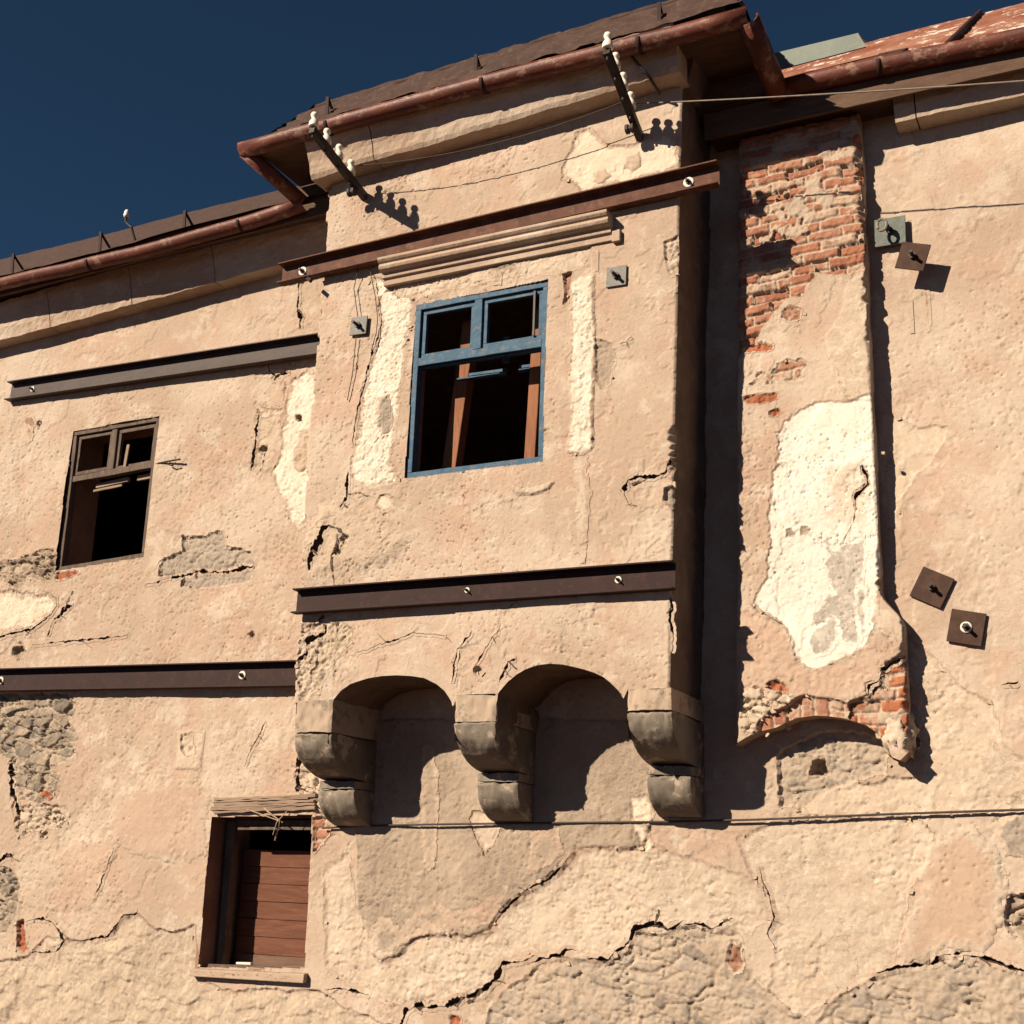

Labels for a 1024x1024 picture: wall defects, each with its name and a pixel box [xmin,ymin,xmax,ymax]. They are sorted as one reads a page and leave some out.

flaking render [738,114,868,356]
peeling [251,368,316,532]
crack [306,472,370,582]
peeling [349,246,616,513]
peeling [739,357,949,670]
crack [840,465,871,544]
flaking render [0,691,78,839]
crack [25,909,139,956]
crack [486,848,576,934]
crack [396,909,735,1024]
flaking render [322,632,1024,1017]
crack [875,947,1024,978]